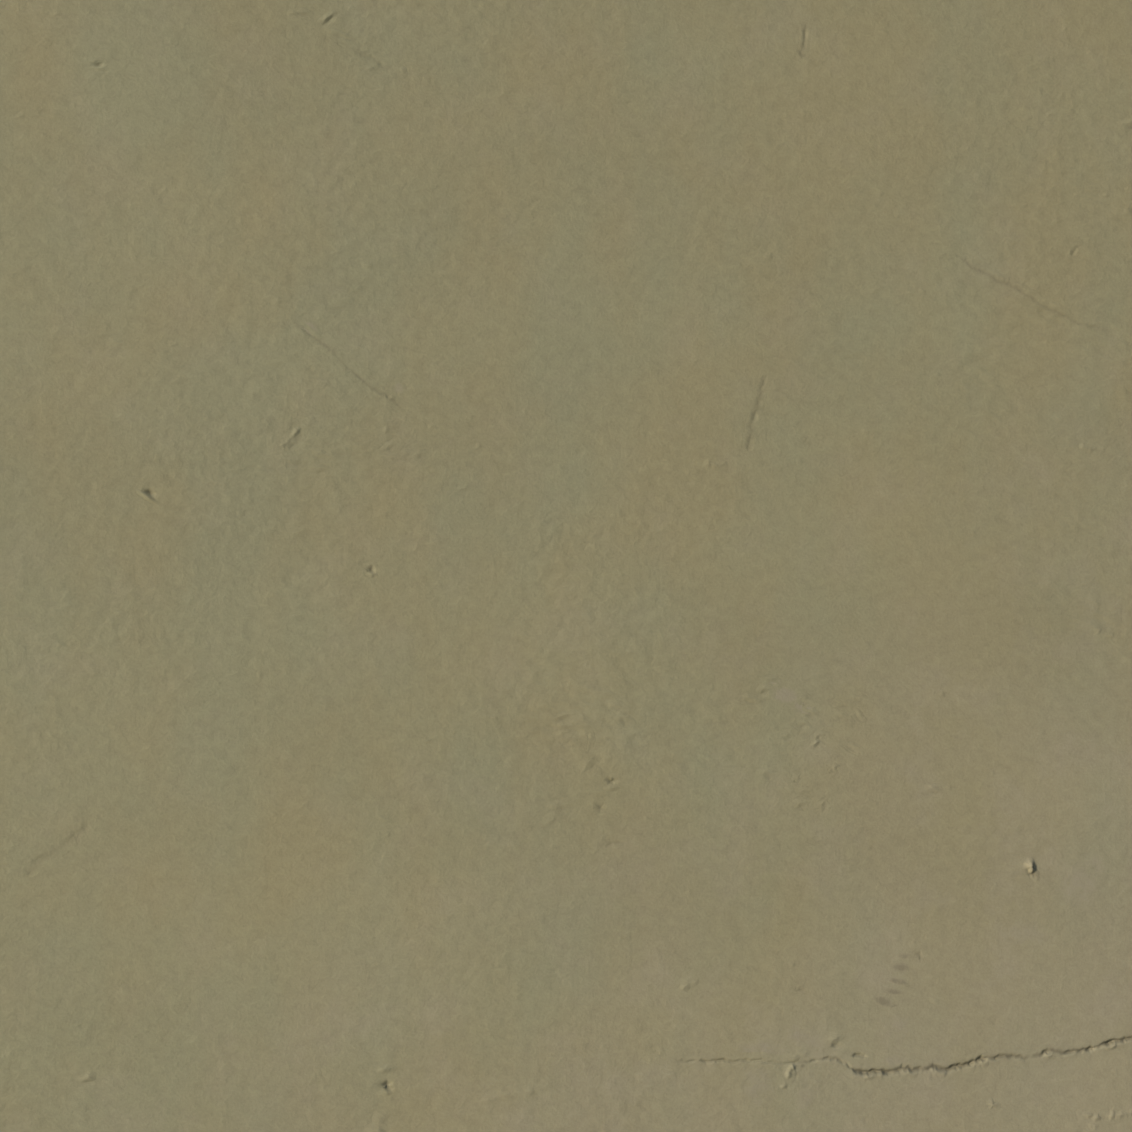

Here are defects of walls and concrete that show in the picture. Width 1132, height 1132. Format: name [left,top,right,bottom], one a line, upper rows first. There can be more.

crack [661,1029,1132,1099]